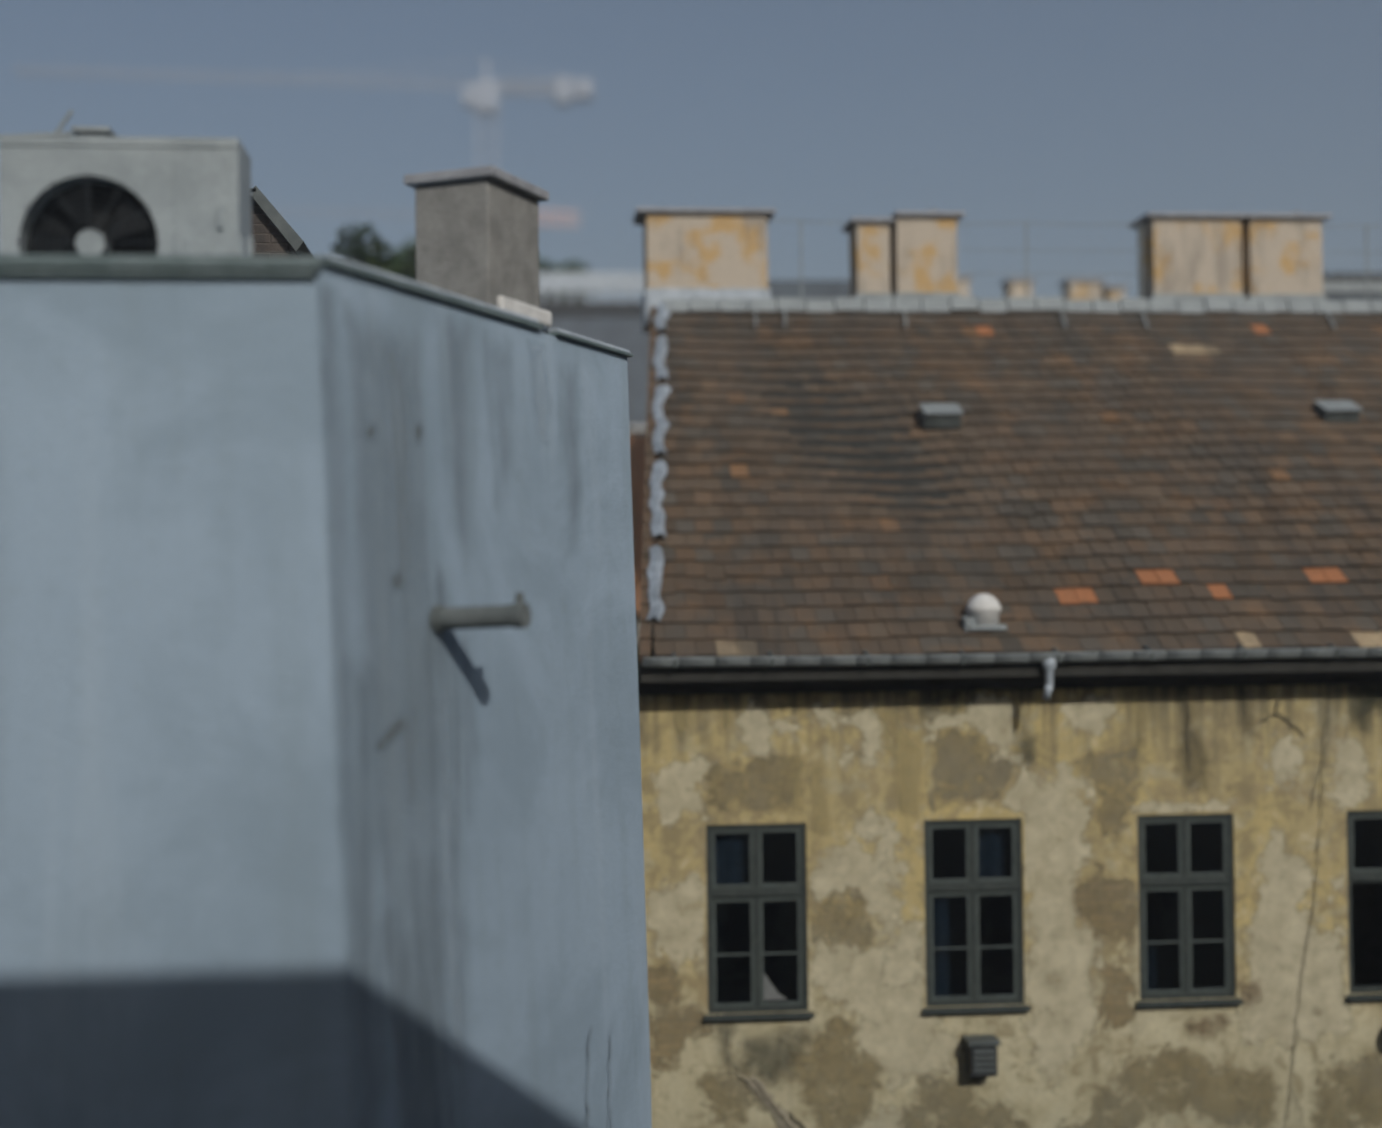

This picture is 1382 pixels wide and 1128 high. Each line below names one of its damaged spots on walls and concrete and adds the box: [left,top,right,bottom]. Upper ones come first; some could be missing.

peeling [645,753,718,828]
peeling [1129,797,1237,815]
peeling [1261,733,1307,792]
peeling [1323,719,1376,812]
peeling [645,868,713,1077]
peeling [729,693,1138,1128]
peeling [1225,824,1355,1053]
crack [1258,685,1329,1128]
spalling [697,1070,766,1122]
spalling [1062,1044,1275,1128]